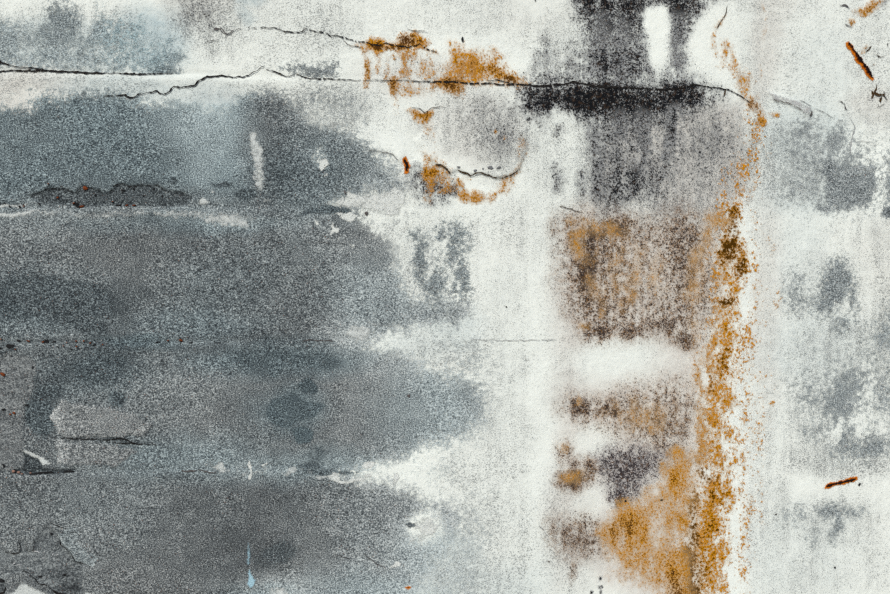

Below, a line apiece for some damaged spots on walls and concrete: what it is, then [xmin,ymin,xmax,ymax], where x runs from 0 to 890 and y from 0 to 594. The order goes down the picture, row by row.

crack [205,22,436,52]
corrosion [848,0,881,26]
crack [0,60,750,103]
corrosion [357,30,537,142]
water stain [0,132,274,229]
water stain [297,205,350,217]
water stain [405,162,463,208]
corrosion [421,138,529,205]
water stain [467,0,754,353]
water stain [0,275,114,338]
peeling [0,0,520,594]
corrosion [595,15,784,594]